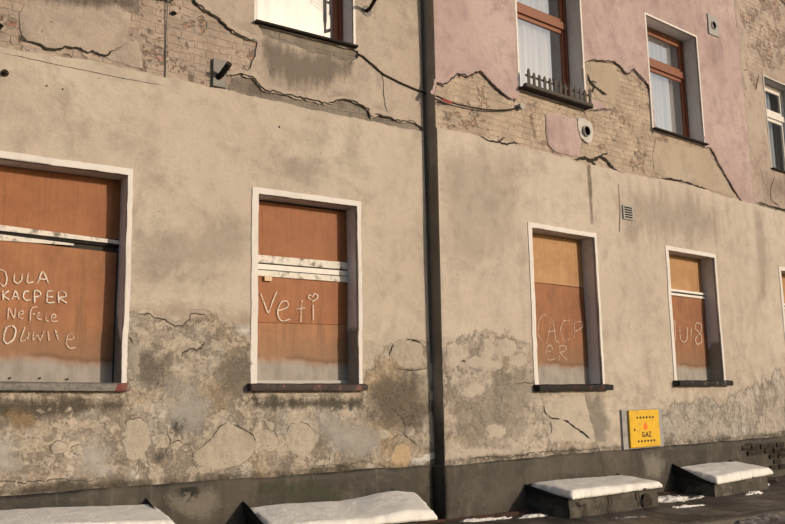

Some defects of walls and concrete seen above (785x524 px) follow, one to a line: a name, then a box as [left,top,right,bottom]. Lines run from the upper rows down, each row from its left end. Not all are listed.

spalling [0,0,424,132]
damp [265,41,347,84]
crack [227,63,423,126]
spalling [432,60,739,200]
crack [661,178,705,189]
crack [714,153,785,211]
crack [135,308,213,357]
peeling [0,311,435,518]
peeling [442,329,599,466]
damp [16,481,142,495]
damp [170,479,197,499]
damp [412,421,525,516]